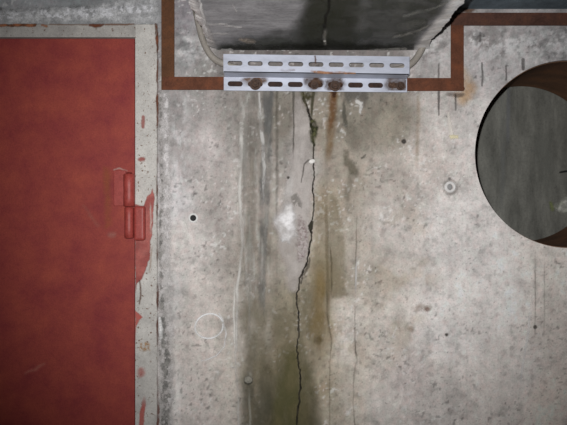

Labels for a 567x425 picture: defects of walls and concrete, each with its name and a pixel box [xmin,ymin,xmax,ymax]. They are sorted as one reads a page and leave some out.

spalling [135,93,175,425]
damp [258,92,272,145]
damp [274,100,311,290]
crack [296,91,318,425]